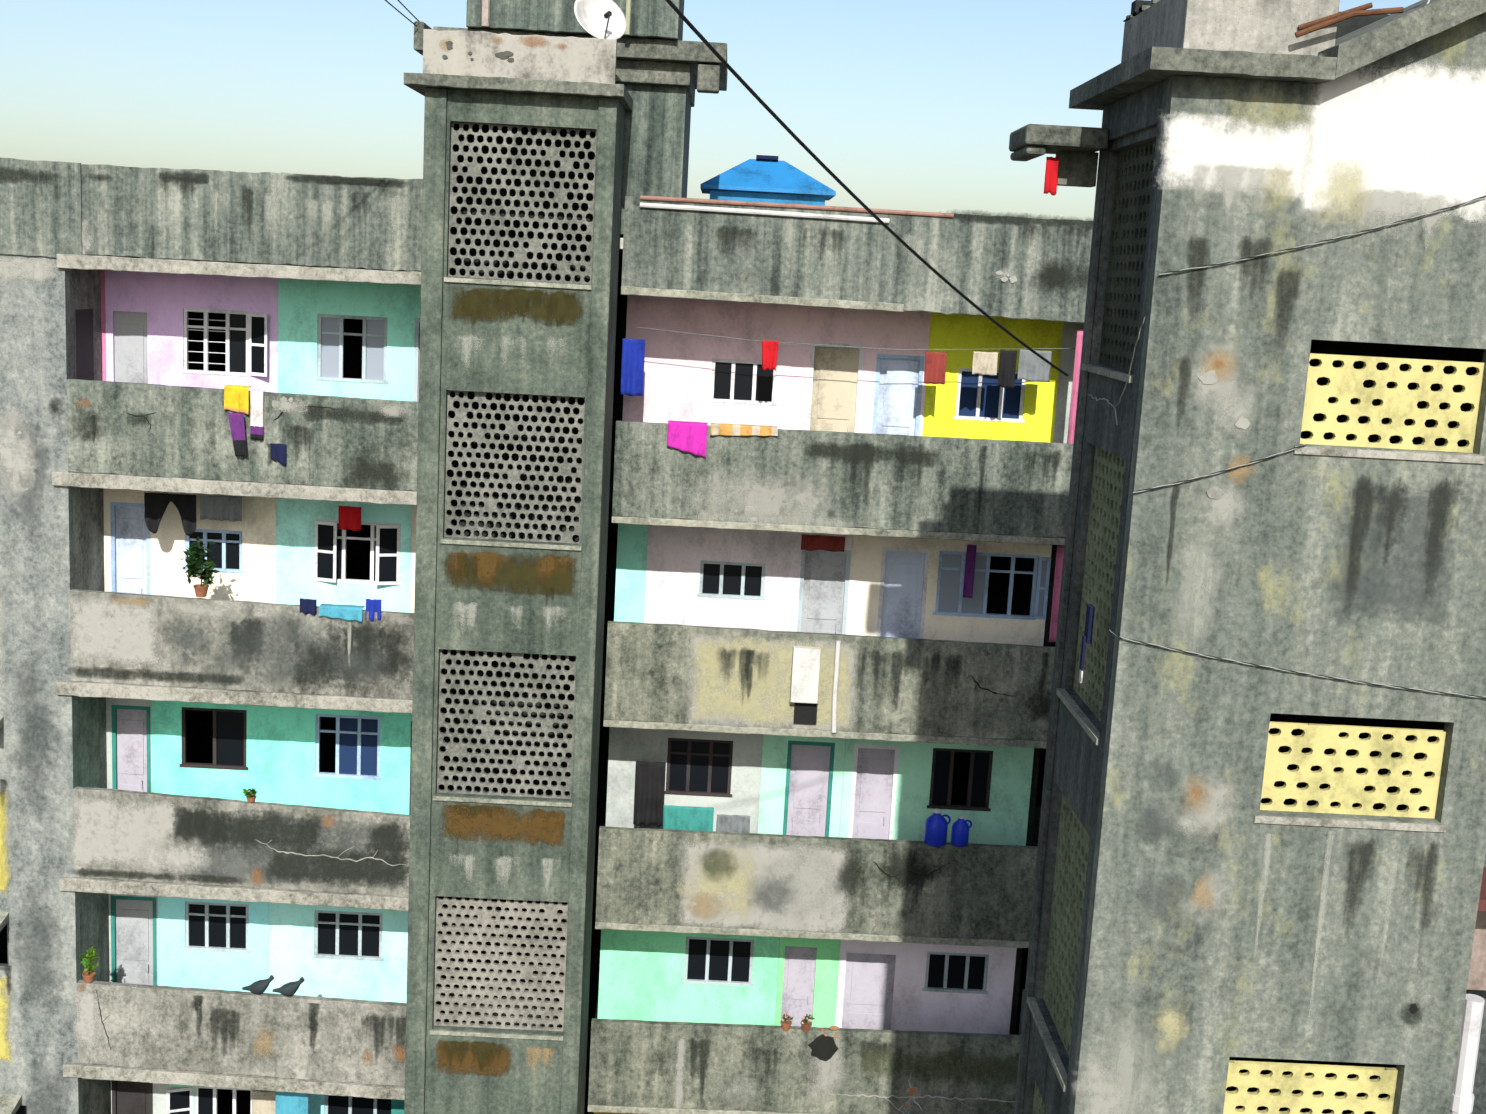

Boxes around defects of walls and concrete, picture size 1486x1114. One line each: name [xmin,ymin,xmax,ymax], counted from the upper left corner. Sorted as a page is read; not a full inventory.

rust [453,288,582,326]
water stain [1189,239,1208,296]
water stain [1240,238,1298,332]
crack [1088,317,1145,425]
rust [445,552,575,600]
water stain [72,614,414,689]
rust [444,805,564,846]
crack [257,840,404,866]
crack [874,862,948,884]
water stain [192,995,239,1044]
water stain [309,1003,319,1046]
rust [437,1041,510,1076]